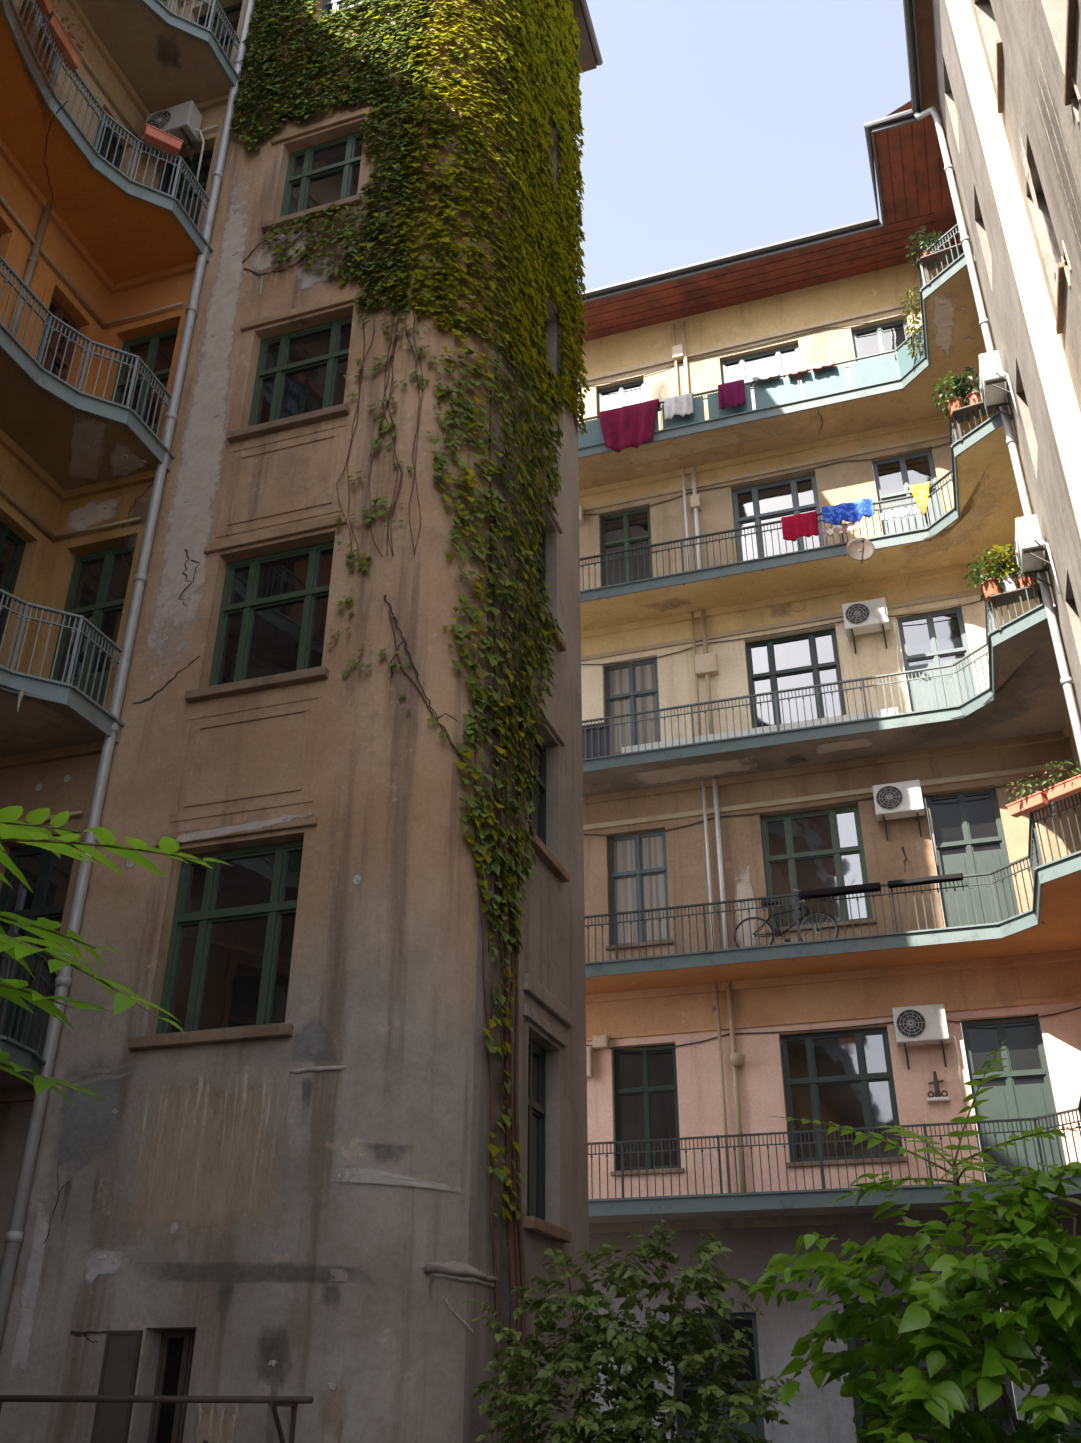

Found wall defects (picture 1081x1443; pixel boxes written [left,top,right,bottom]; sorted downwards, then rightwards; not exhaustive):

peeling [932,294,971,362]
peeling [110,442,147,477]
peeling [67,499,120,532]
leakage [128,1071,311,1236]